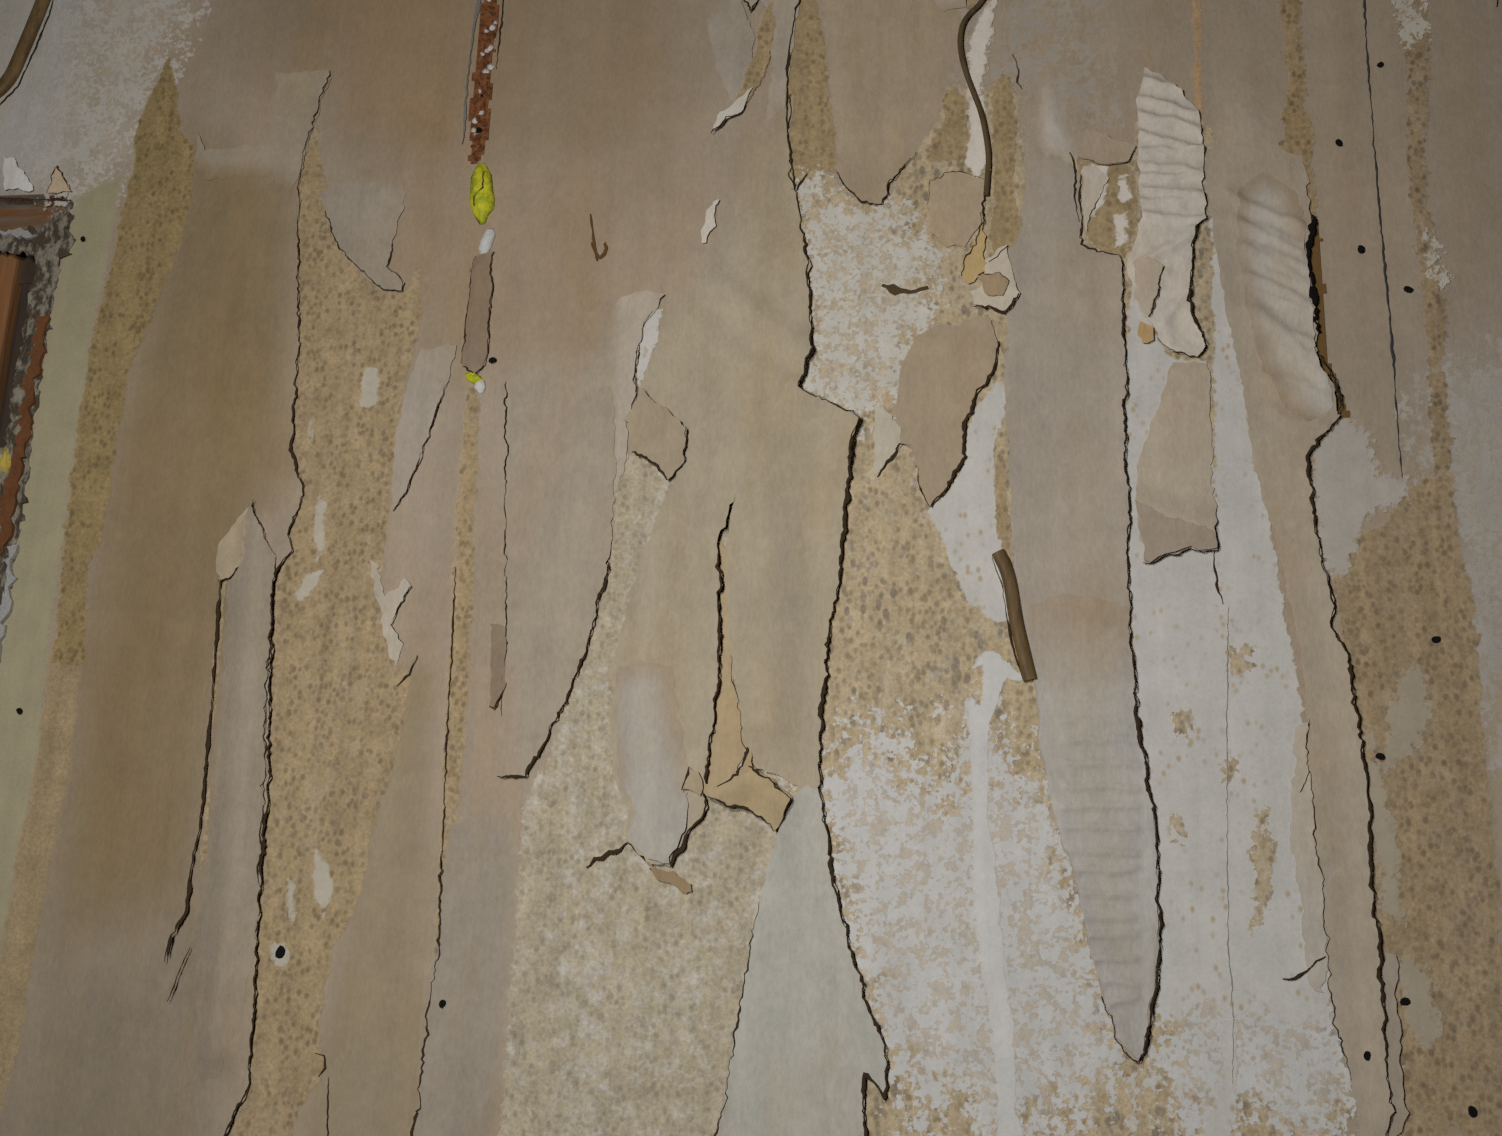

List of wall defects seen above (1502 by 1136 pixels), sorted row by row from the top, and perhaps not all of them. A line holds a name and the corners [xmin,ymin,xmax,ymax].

flaking render [792,164,952,441]
flaking render [1311,419,1411,578]
flaking render [819,218,1358,1136]
crack [315,1053,329,1136]